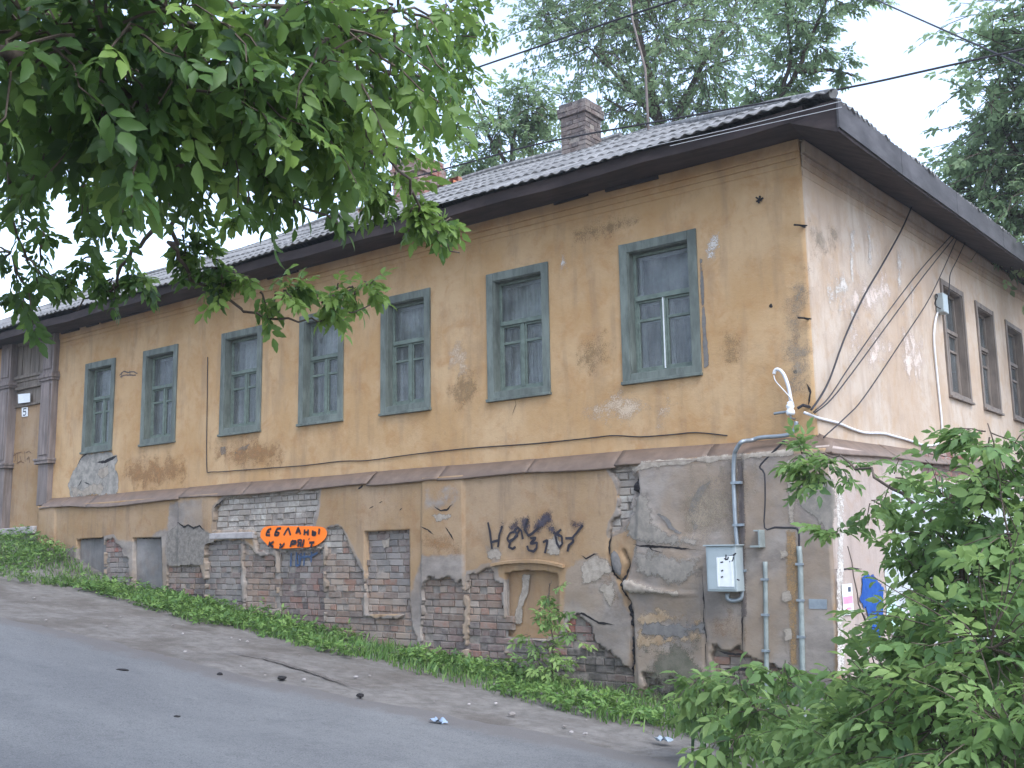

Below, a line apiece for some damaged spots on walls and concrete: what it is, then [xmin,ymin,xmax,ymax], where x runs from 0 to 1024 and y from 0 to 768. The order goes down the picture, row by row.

flaking render [68,452,119,497]
flaking render [106,538,131,585]
flaking render [165,490,707,699]
crack [576,537,695,695]